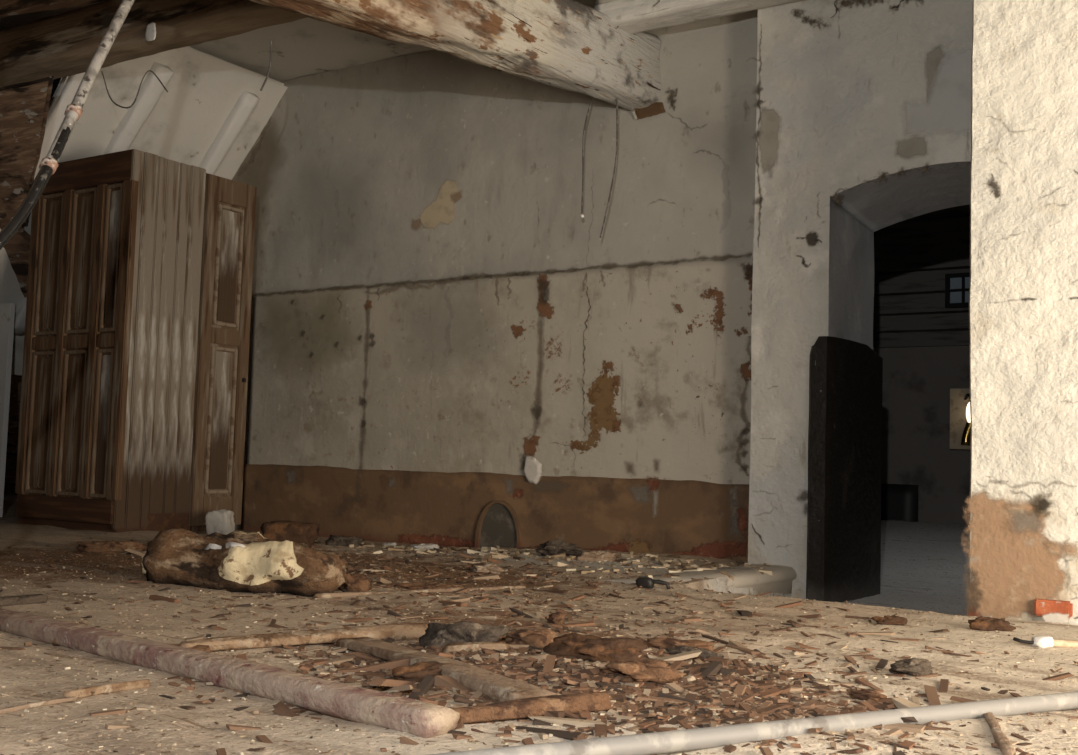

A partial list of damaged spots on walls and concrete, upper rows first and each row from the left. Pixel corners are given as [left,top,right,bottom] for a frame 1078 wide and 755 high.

water stain [831,0,920,18]
rust [511,272,561,457]
rust [571,360,621,454]
flaking render [966,492,1078,623]